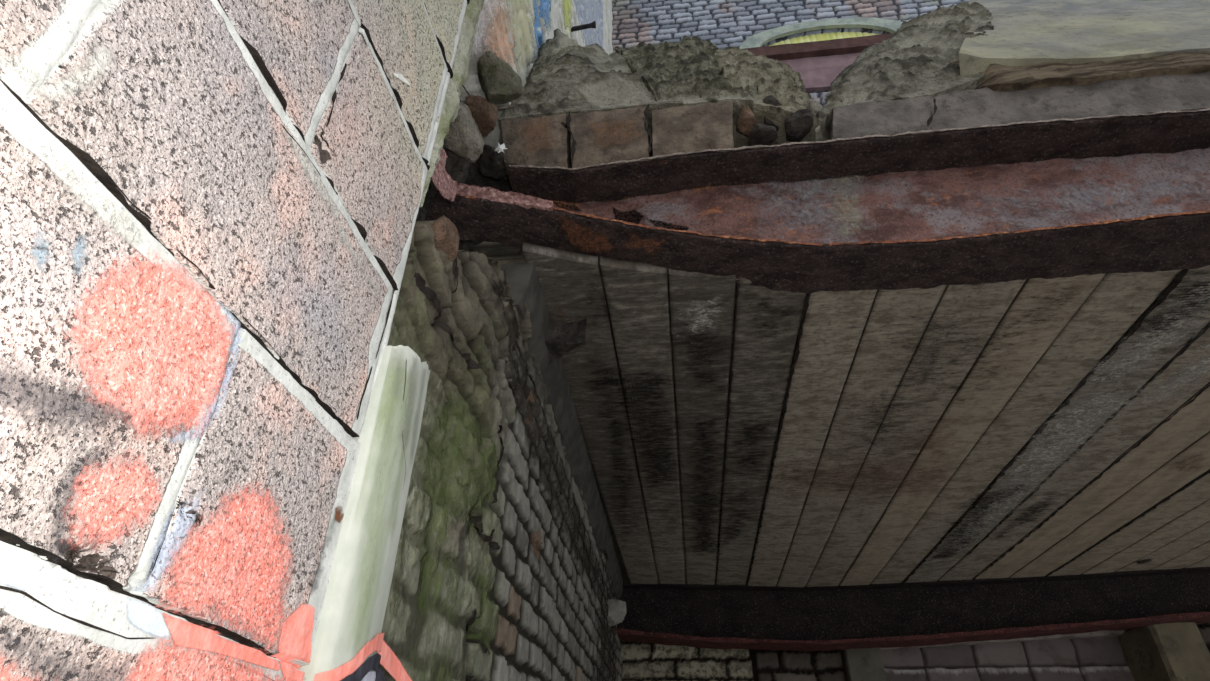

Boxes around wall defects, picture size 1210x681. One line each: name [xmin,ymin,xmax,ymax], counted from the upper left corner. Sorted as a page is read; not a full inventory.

damp [1131,272,1210,343]
damp [590,366,677,512]
damp [690,418,769,553]
crack [0,501,275,681]